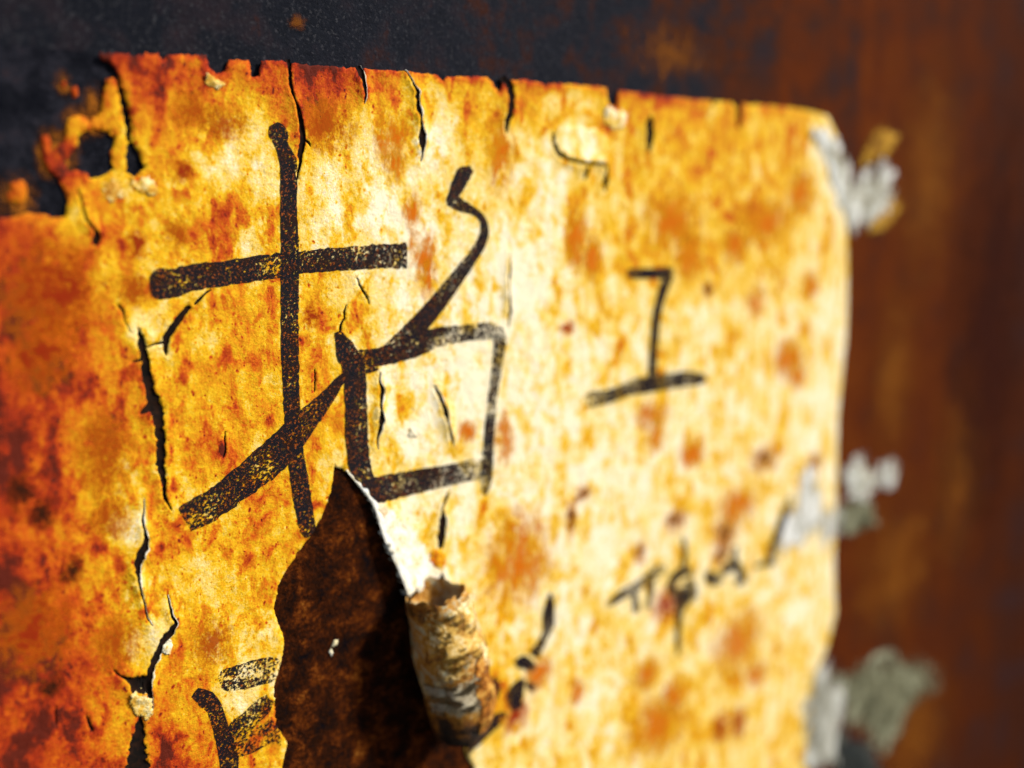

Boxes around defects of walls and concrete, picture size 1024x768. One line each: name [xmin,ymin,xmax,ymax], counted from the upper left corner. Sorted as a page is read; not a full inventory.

peeling [0,45,158,219]
crack [285,59,311,180]
rust [375,112,408,178]
crack [403,69,428,162]
rust [126,230,147,256]
rust [403,199,436,294]
rust [564,212,602,278]
rust [460,420,476,442]
rust [495,410,513,465]
rust [9,476,55,528]
crack [113,289,211,768]
peeling [429,548,447,569]